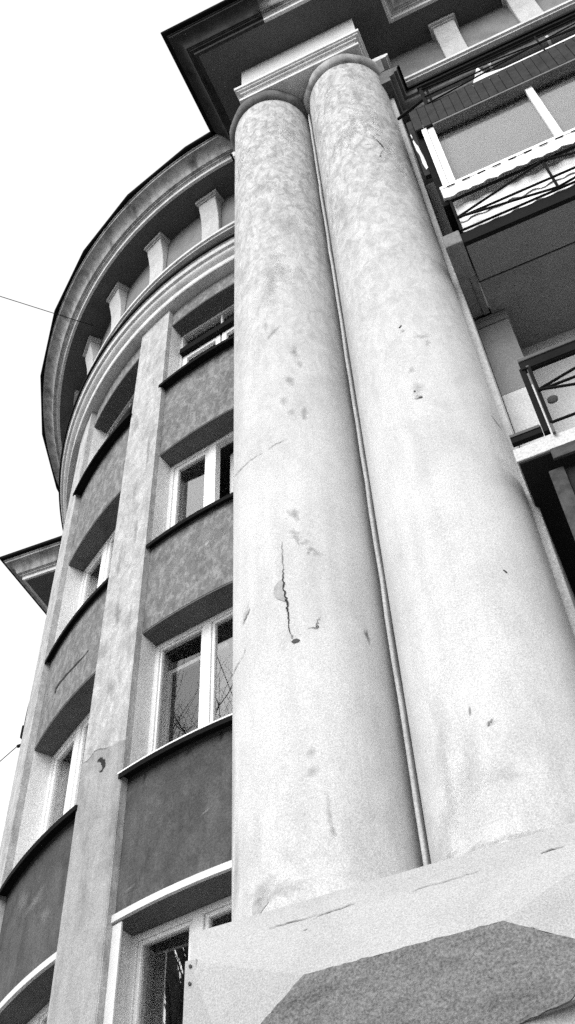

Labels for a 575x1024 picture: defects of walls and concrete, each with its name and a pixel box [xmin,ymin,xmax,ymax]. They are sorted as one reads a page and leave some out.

crack [273,545,321,644]